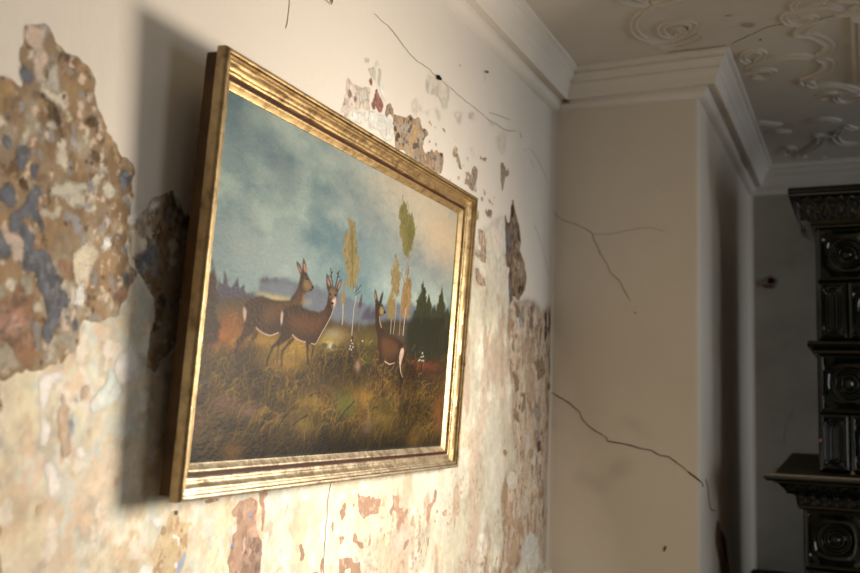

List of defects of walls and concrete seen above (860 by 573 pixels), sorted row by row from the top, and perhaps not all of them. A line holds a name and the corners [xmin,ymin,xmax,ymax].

crack [375,14,549,184]
peeling [0,23,190,516]
spalling [331,59,551,573]
peeling [138,511,192,573]
peeling [227,492,268,573]
crack [551,392,715,511]